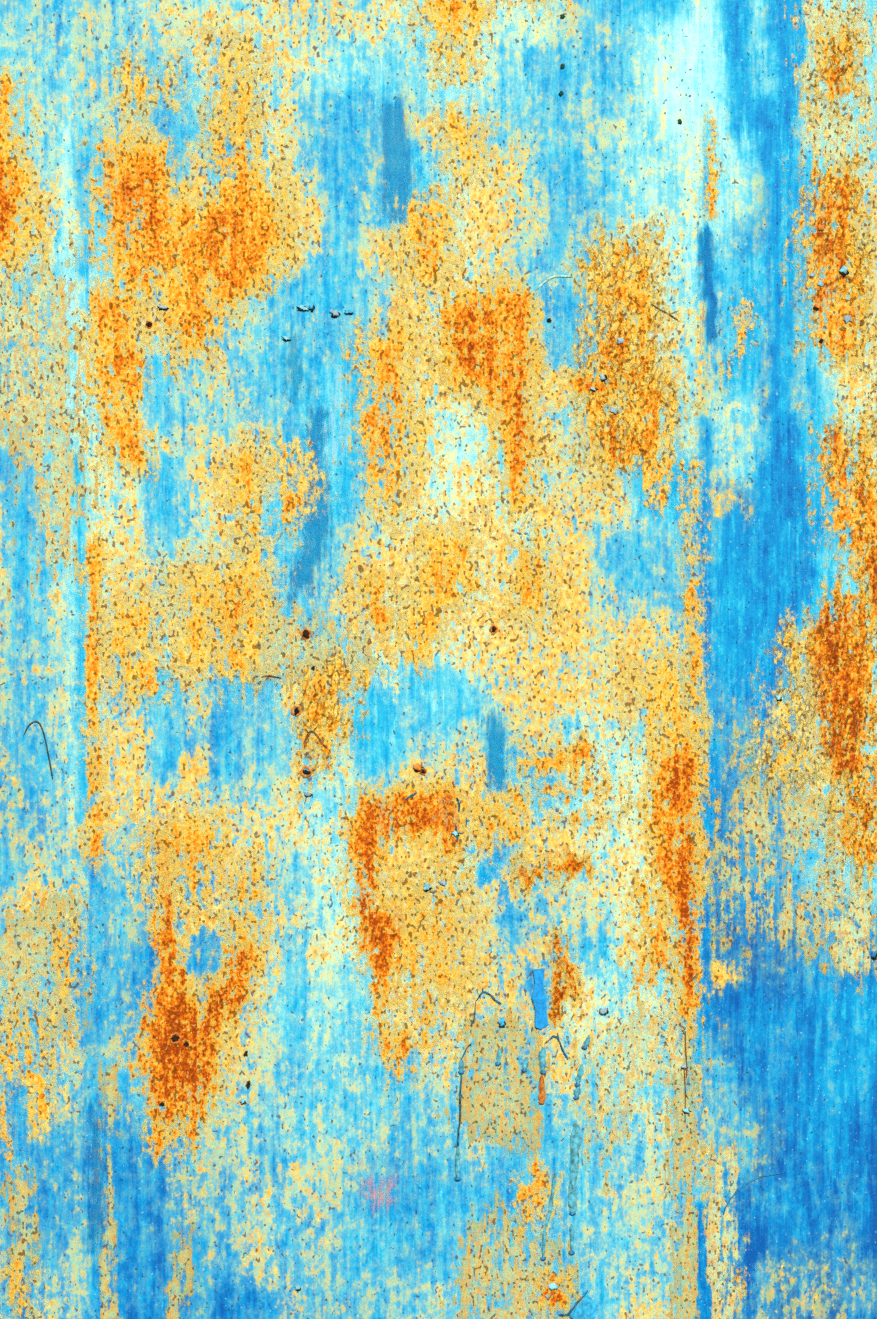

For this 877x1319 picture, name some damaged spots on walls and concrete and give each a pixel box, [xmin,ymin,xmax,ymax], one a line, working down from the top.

corrosion [0,67,53,282]
corrosion [117,806,274,1165]
corrosion [65,0,763,1088]
corrosion [733,0,877,900]